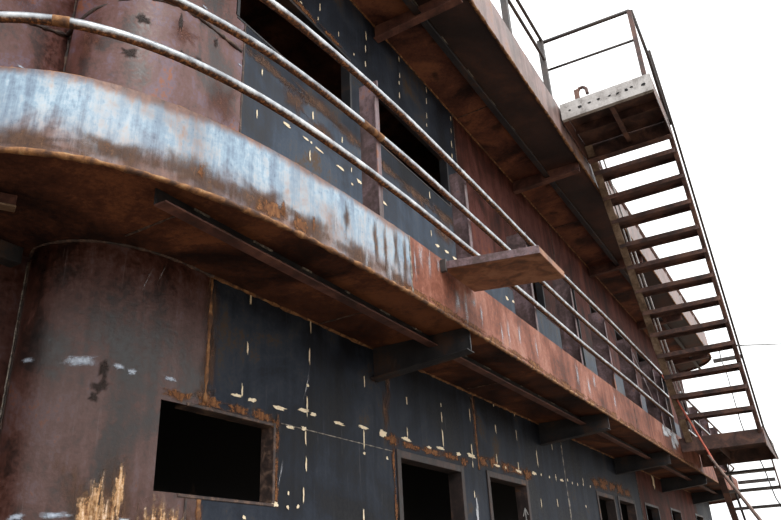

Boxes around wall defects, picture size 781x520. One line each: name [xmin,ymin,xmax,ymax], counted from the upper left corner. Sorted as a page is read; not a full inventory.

rust [0,129,53,149]
rust [79,136,141,166]
rust [164,154,329,241]
rust [164,286,279,508]
rust [383,379,469,520]